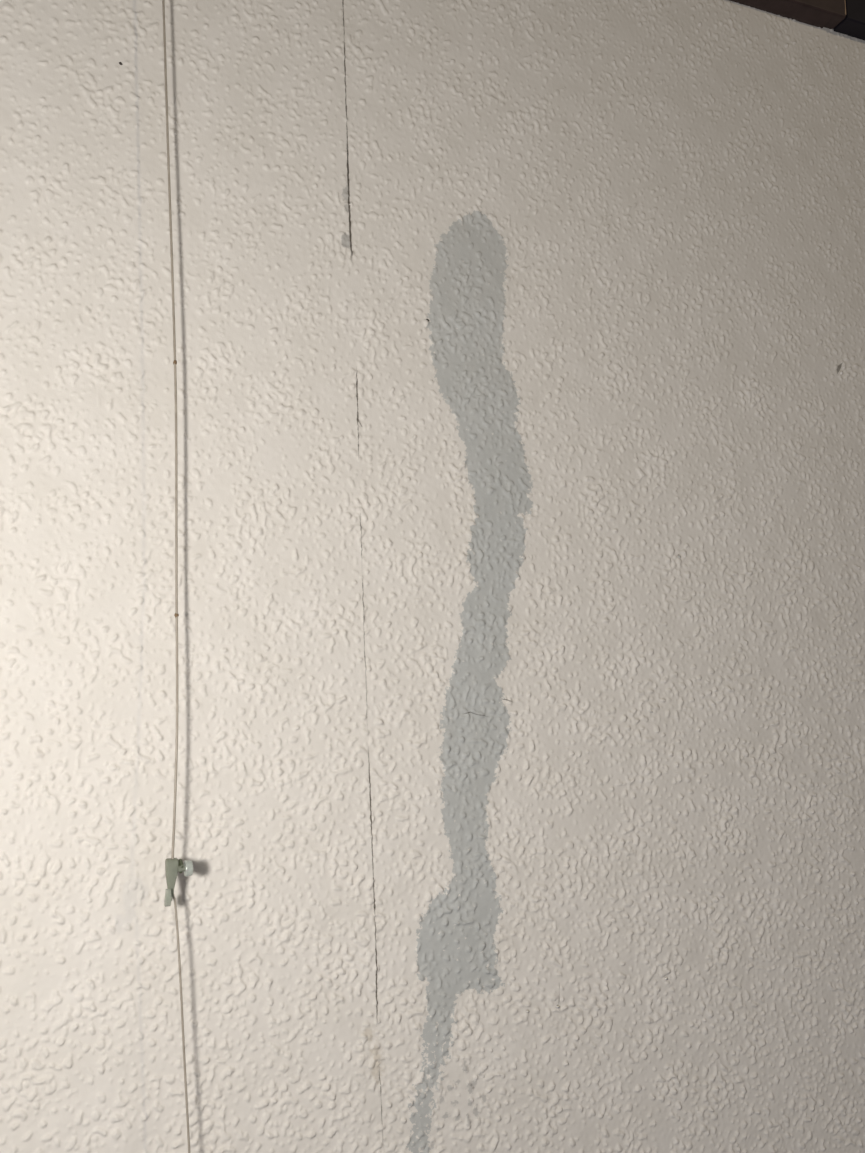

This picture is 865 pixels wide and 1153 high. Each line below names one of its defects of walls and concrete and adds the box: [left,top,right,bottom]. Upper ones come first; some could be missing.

crack [339,11,353,255]
crack [353,373,361,453]
water stain [405,206,538,1153]
crack [369,764,378,1011]